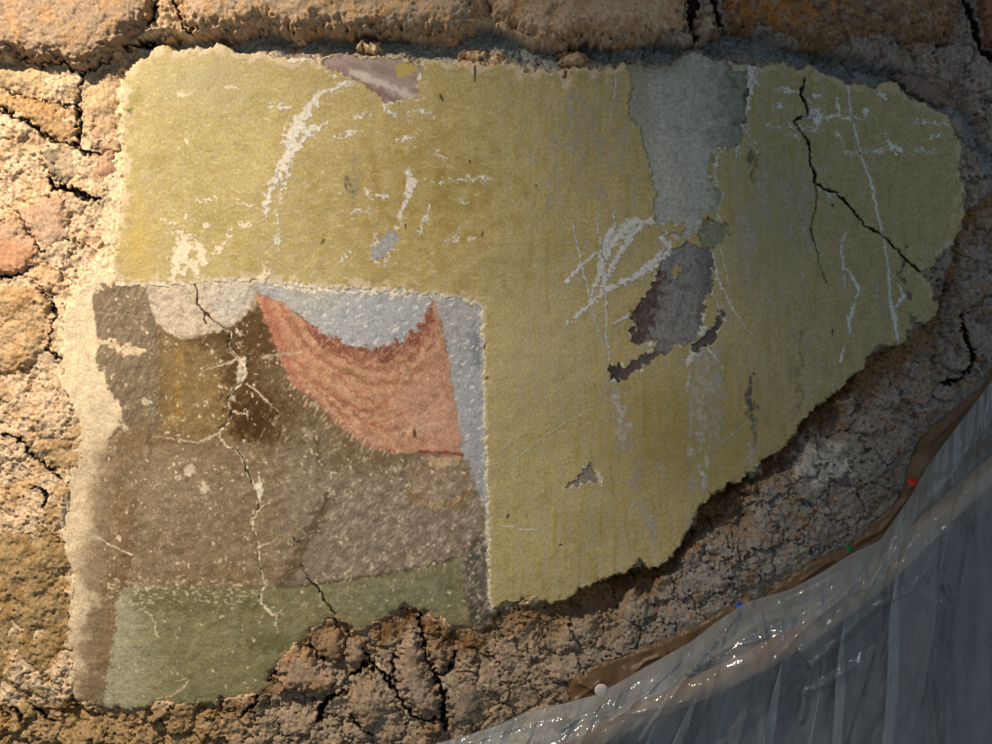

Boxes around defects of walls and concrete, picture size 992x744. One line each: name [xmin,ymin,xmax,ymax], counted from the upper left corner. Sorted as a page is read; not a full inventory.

peeling [160,195,252,285]
spalling [237,52,435,252]
peeling [369,167,493,268]
peeling [608,49,950,383]
crack [793,78,919,272]
crack [154,283,457,735]
spalling [561,462,603,489]